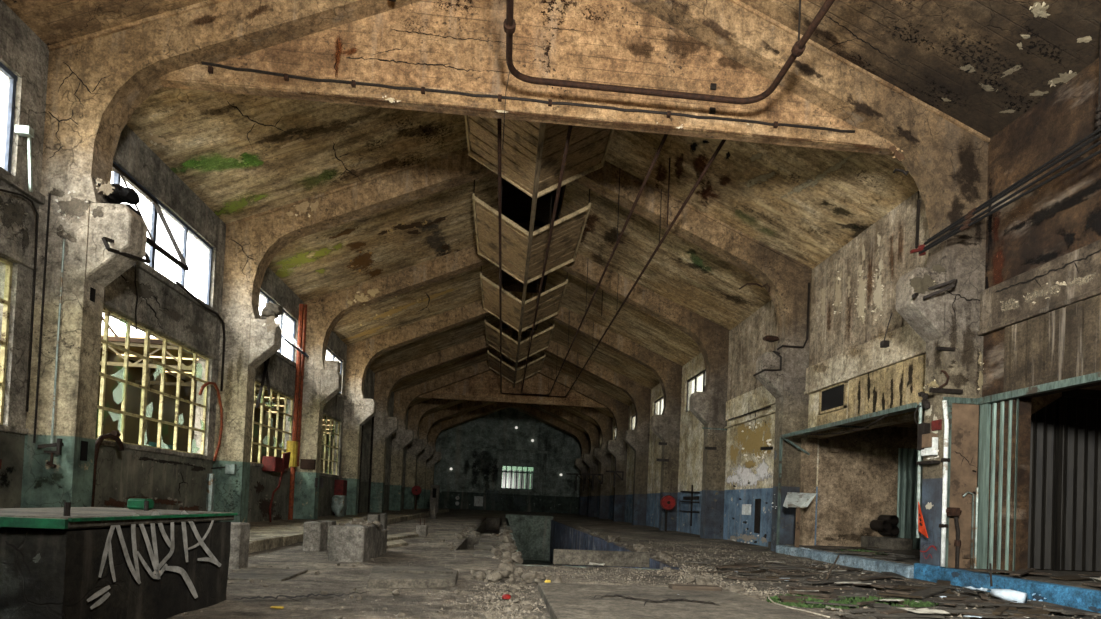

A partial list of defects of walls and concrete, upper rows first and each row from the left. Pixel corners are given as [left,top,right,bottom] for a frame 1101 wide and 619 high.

spalling [1029,2,1050,18]
rust [335,38,356,77]
leakage [533,0,606,73]
peeling [960,64,1021,92]
peeling [1029,70,1077,96]
crack [48,62,109,158]
leakage [948,148,1101,289]
peeling [730,418,777,469]